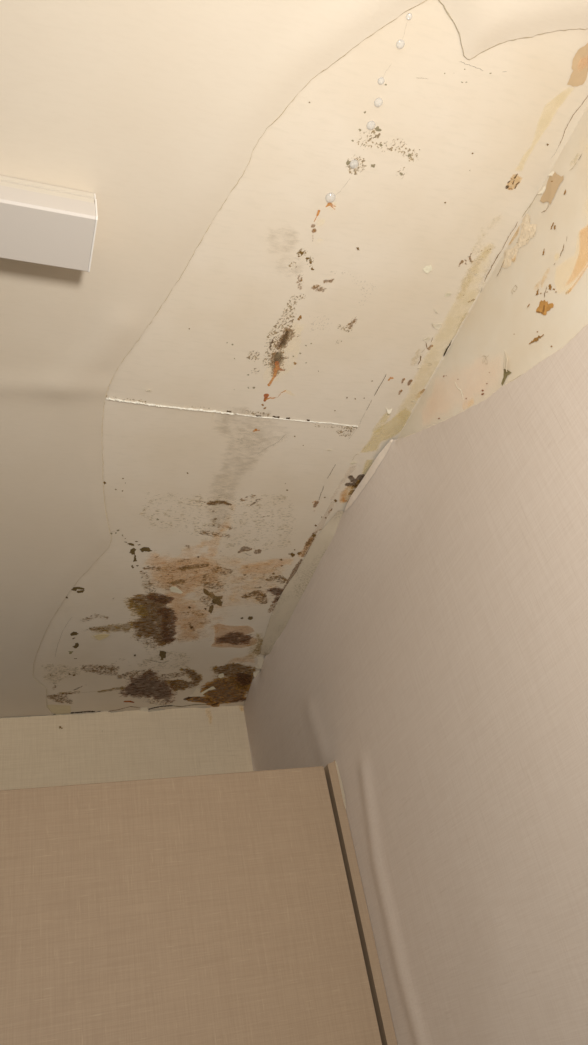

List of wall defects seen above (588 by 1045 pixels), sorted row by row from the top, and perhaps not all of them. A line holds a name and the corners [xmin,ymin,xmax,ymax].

peeling [567,43,588,87]
peeling [537,171,564,213]
water stain [234,249,334,389]
peeling [536,300,554,315]
water stain [241,474,365,611]
water stain [82,545,233,648]
water stain [47,663,256,707]